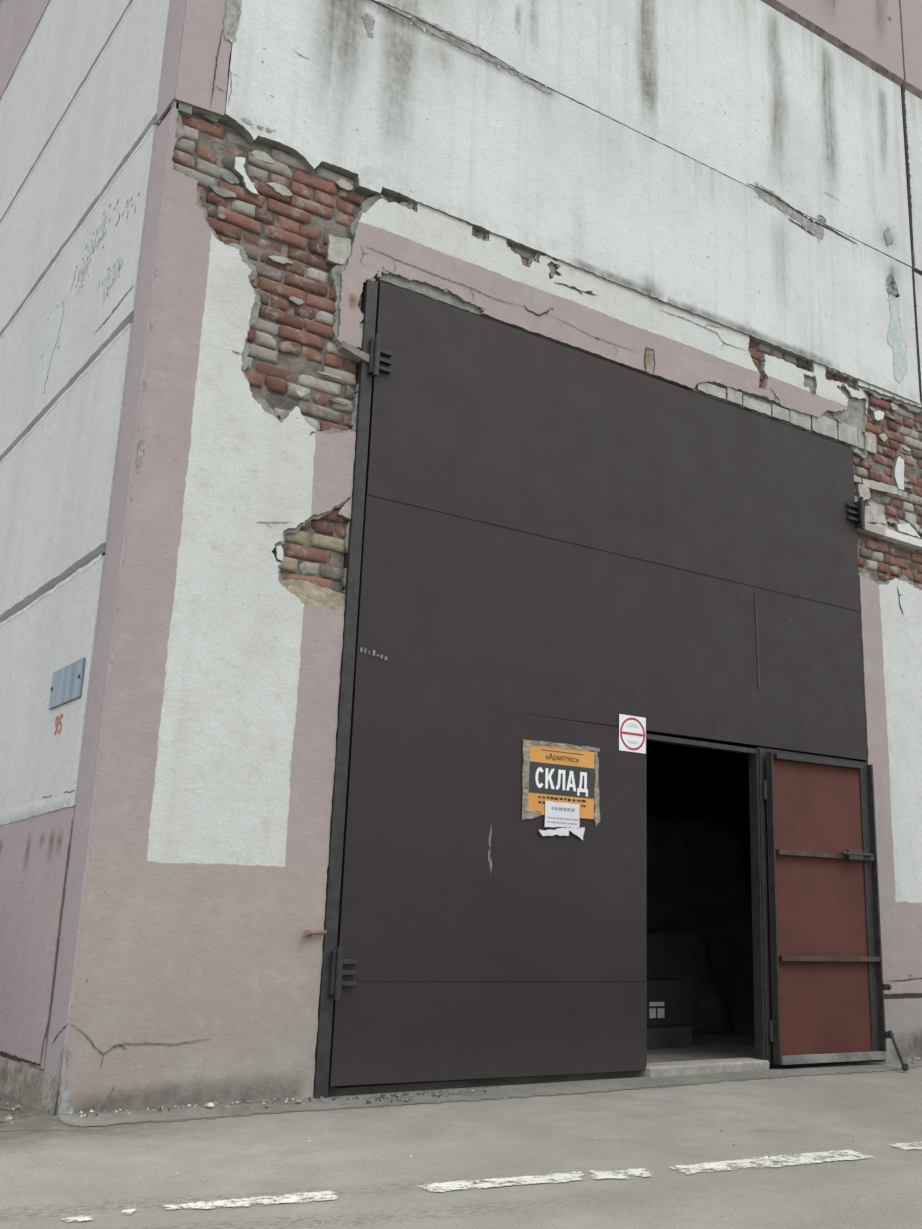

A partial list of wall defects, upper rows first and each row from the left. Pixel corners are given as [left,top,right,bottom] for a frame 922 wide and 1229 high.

peeling [224,0,242,42]
peeling [361,13,375,38]
flaking render [172,108,416,434]
flaking render [369,267,484,315]
flaking render [472,226,488,241]
flaking render [506,240,560,279]
peeling [755,181,826,242]
peeling [886,275,908,383]
flaking render [692,337,922,590]
flaking render [272,497,352,611]
crack [40,820,212,1112]